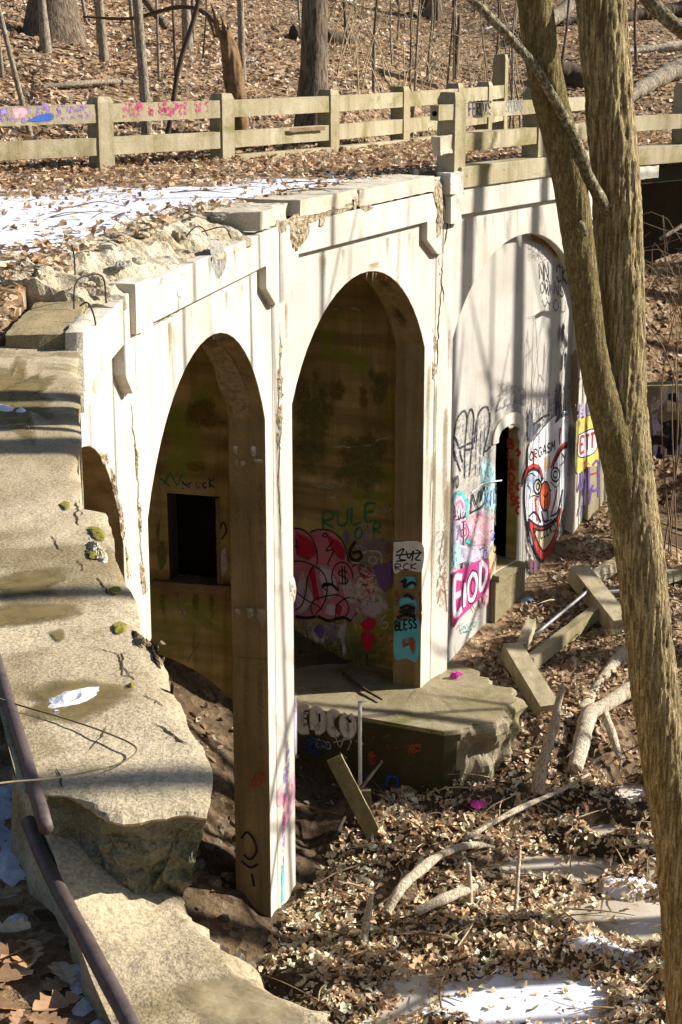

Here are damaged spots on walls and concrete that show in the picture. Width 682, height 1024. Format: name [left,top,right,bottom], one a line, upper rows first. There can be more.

spalling [0,207,253,326]
spalling [274,197,374,251]
spalling [432,179,444,238]
crack [437,193,451,365]
spalling [88,538,108,563]
spalling [100,452,148,595]